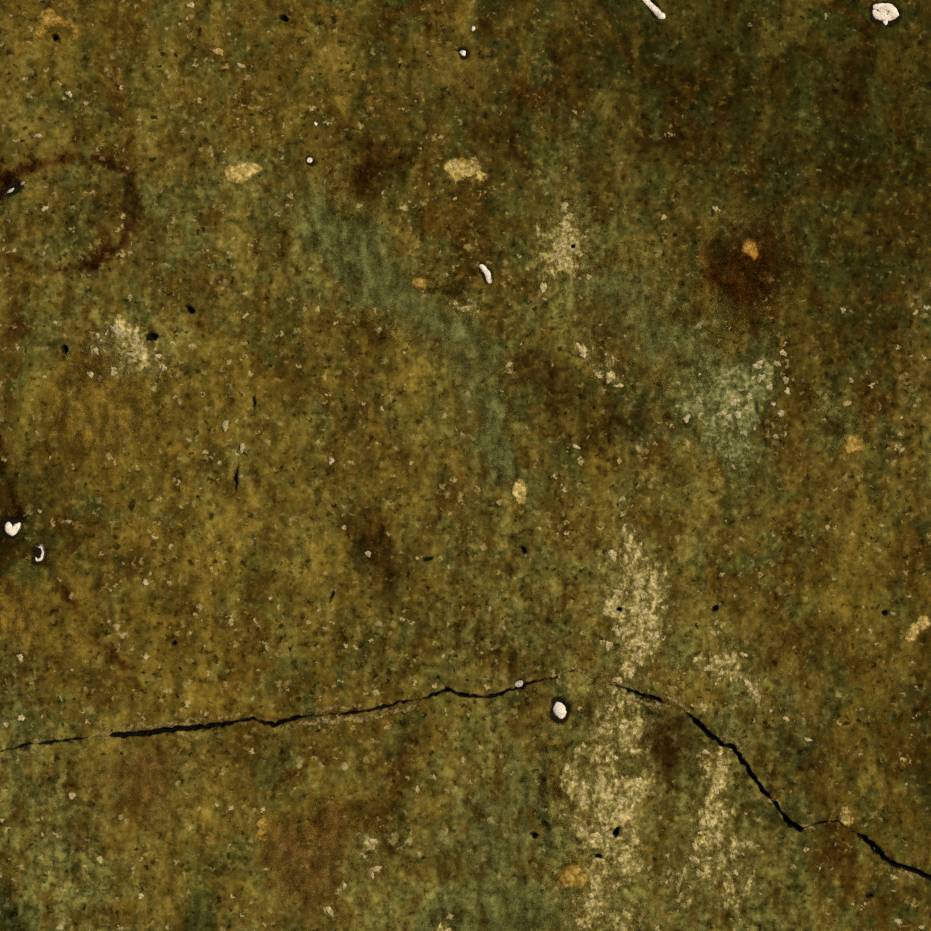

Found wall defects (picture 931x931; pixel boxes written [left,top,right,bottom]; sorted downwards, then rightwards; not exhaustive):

rust [742,239,758,259]
crack [1,667,931,881]